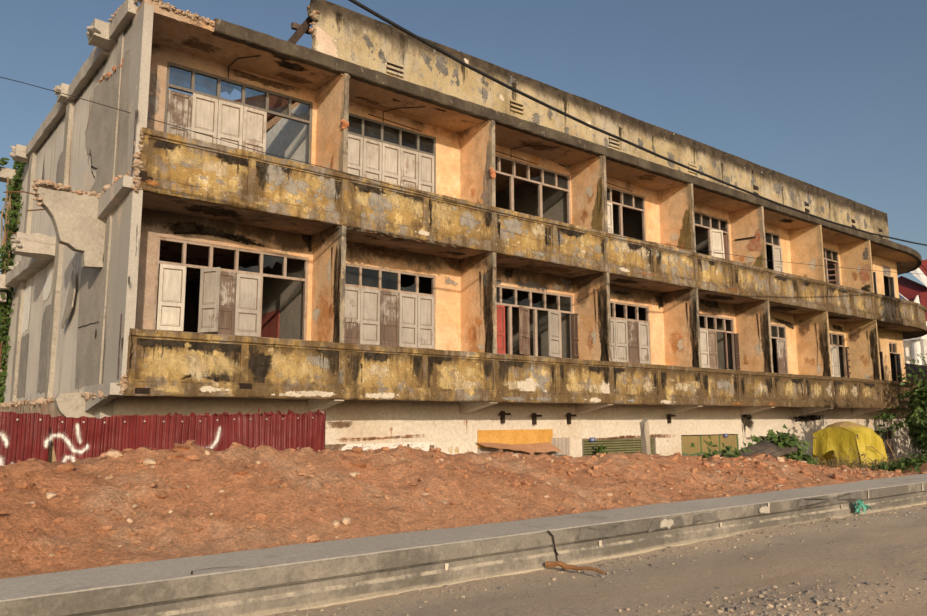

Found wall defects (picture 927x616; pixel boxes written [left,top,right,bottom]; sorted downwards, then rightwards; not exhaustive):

spalling [108,0,215,34]
peeling [363,24,387,65]
peeling [421,49,469,86]
peeling [481,76,504,101]
damp [353,183,386,196]
damp [397,193,439,225]
damp [485,212,500,235]
damp [545,227,585,245]
damp [628,243,661,269]
damp [410,355,452,387]
peeling [502,365,551,402]